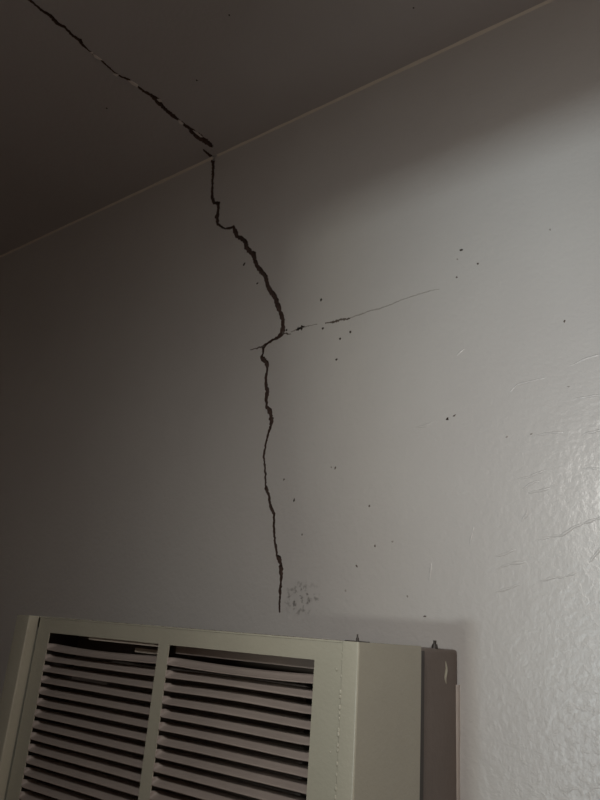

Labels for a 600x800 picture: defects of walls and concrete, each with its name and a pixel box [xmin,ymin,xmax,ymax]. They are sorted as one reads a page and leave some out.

crack [28,0,438,613]